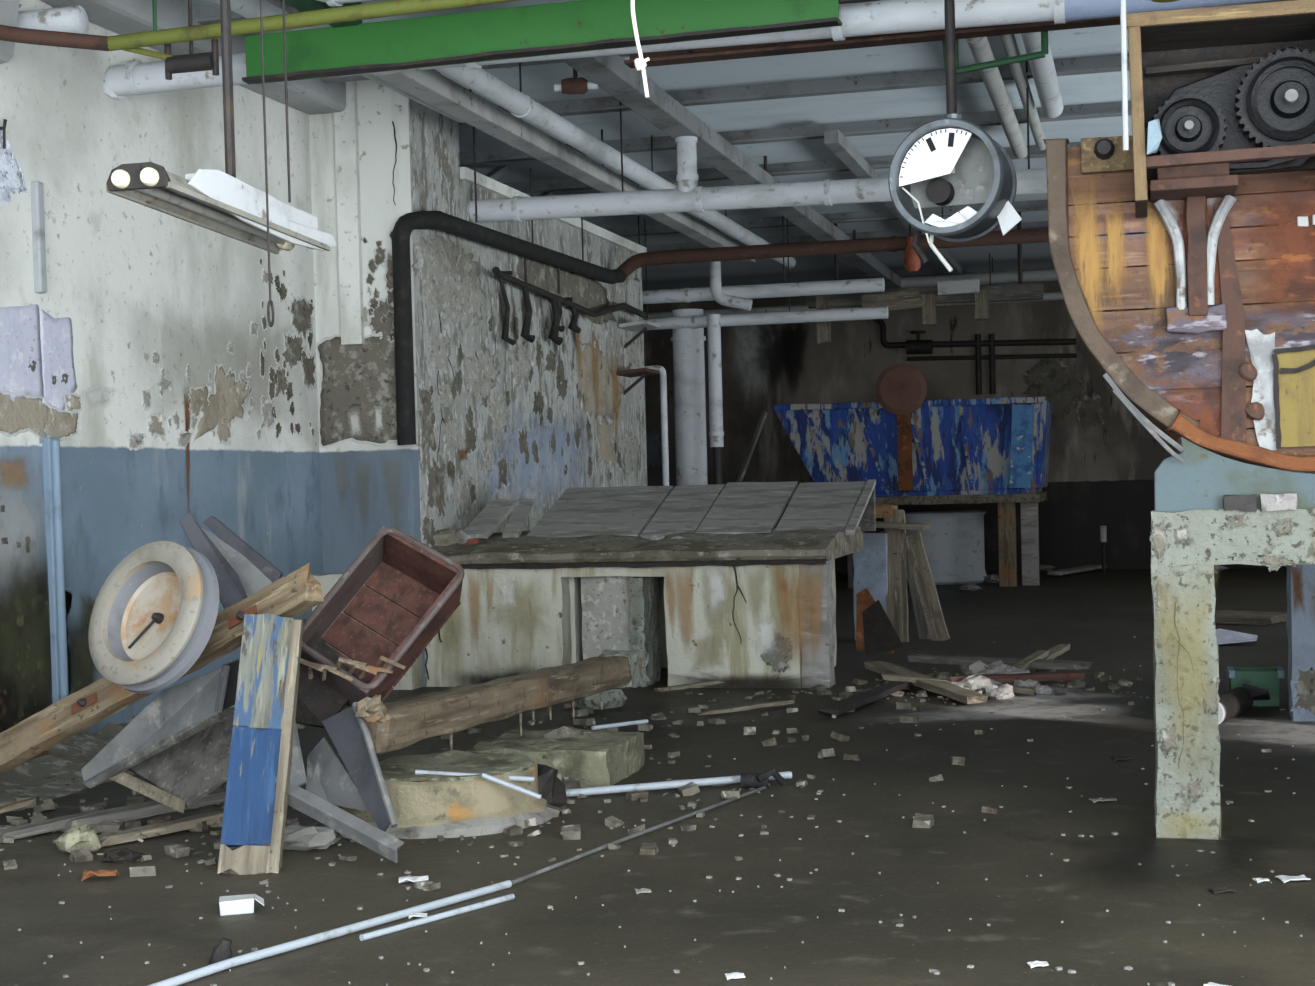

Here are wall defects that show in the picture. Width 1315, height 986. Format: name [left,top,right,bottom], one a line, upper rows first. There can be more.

spalling [0,374,83,444]
spalling [127,231,397,451]
spalling [417,344,510,547]
spalling [496,246,641,492]
peeling [0,496,41,609]
water stain [0,578,51,733]
corrosion [1292,568,1303,606]
spalling [1290,663,1315,718]